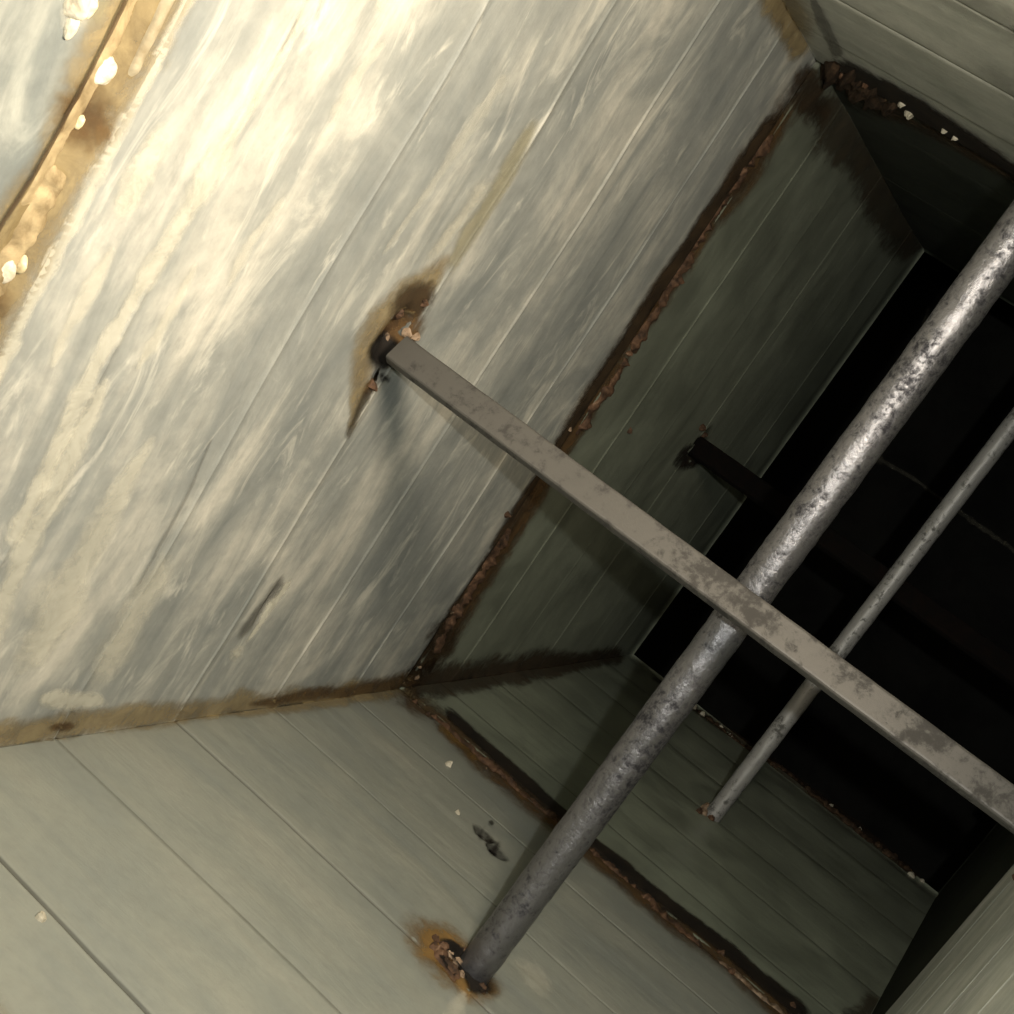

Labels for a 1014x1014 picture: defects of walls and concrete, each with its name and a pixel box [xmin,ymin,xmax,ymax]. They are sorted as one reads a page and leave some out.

corrosion [0,0,181,340]
corrosion [763,0,808,58]
corrosion [560,60,1014,455]
corrosion [0,478,623,830]
corrosion [583,847,796,1014]